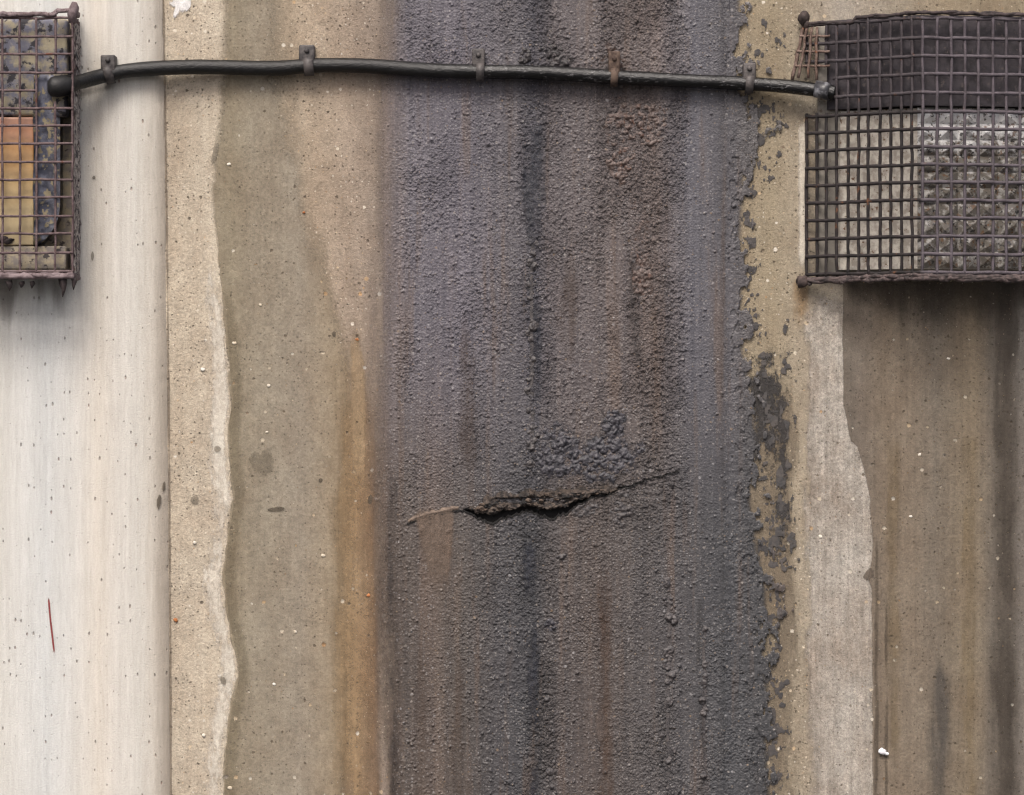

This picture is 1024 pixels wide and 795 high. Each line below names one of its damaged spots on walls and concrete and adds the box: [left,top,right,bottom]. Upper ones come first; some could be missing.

water stain [382,0,738,75]
peeling [722,0,786,76]
rust [336,412,379,795]
crack [407,470,680,525]
water stain [376,75,755,795]
peeling [722,90,800,795]